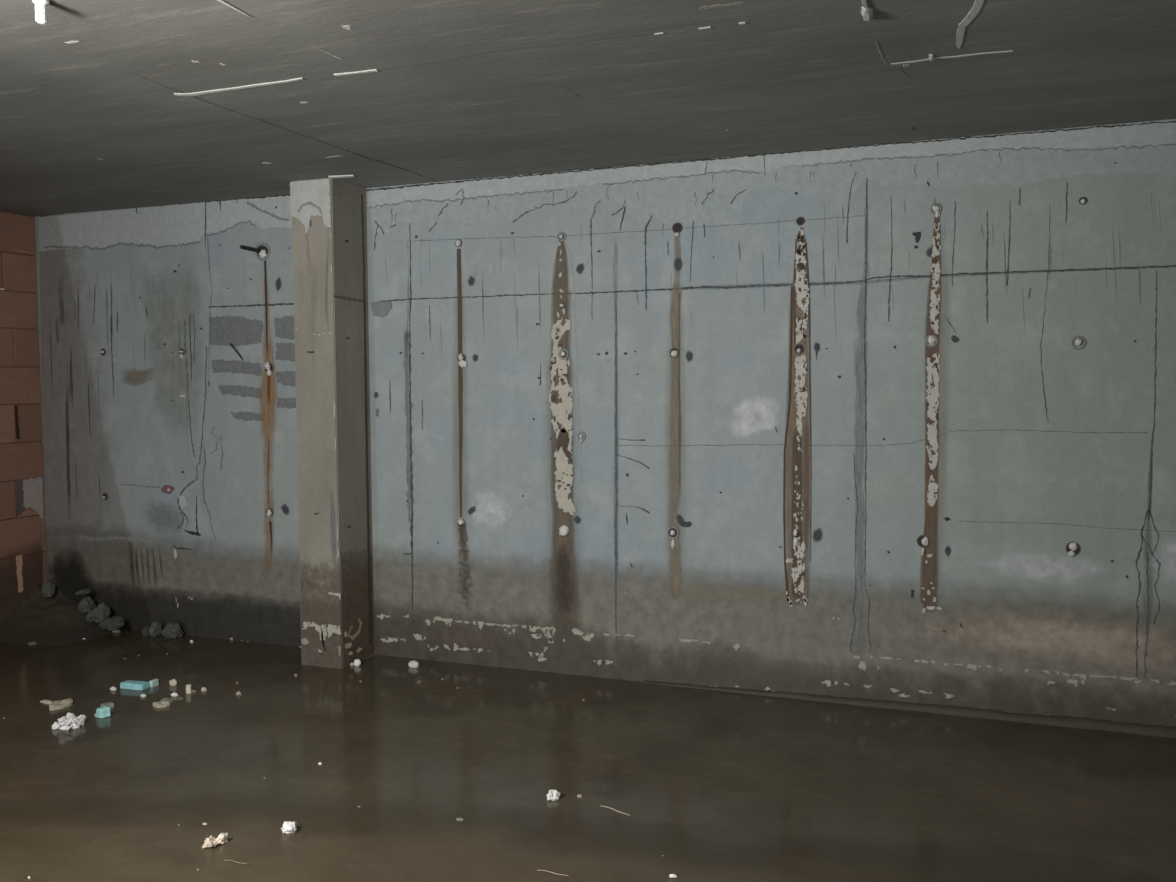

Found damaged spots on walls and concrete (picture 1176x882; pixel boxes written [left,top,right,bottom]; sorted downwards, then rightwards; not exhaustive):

crack [122,303,294,559]
corrosion [262,261,275,473]
flaking render [275,178,331,258]
corrosion [456,249,469,598]
corrosion [547,240,579,620]
corrosion [670,236,681,510]
crack [193,96,1176,679]
corrosion [783,227,812,607]
corrosion [921,217,942,613]
water stain [0,535,1176,727]